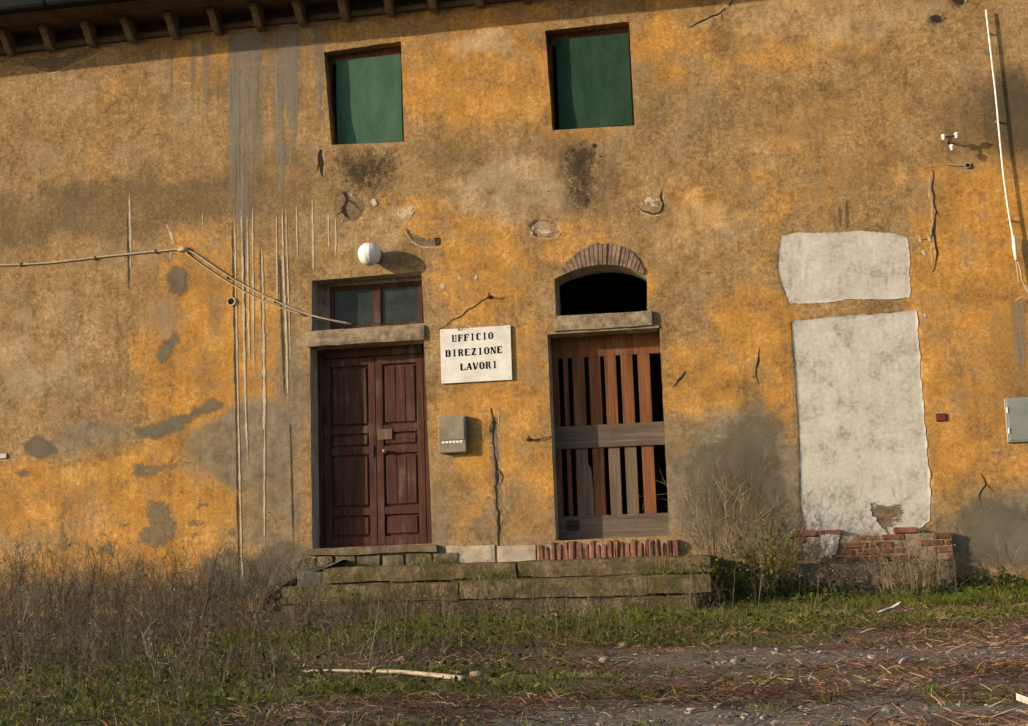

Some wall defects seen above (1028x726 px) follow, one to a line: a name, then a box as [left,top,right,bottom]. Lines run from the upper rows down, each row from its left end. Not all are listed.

crack [690,0,733,27]
damp [336,152,390,197]
spalling [404,229,440,249]
crack [921,170,941,272]
peeling [167,266,187,296]
damp [201,27,305,605]
peeling [156,334,179,362]
peeling [134,398,223,438]
peeling [24,436,57,460]
peeling [125,450,236,488]
crack [489,408,503,546]
peeling [137,487,208,548]